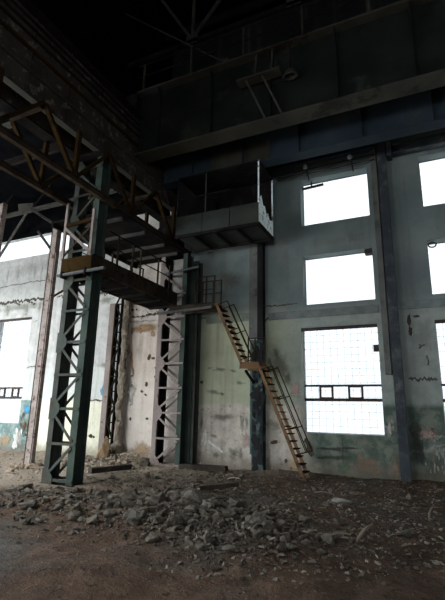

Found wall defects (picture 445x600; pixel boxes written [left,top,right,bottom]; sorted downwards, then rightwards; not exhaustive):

crack [0,280,63,306]
rust [131,324,155,336]
crack [409,344,437,382]
peeling [12,412,28,449]